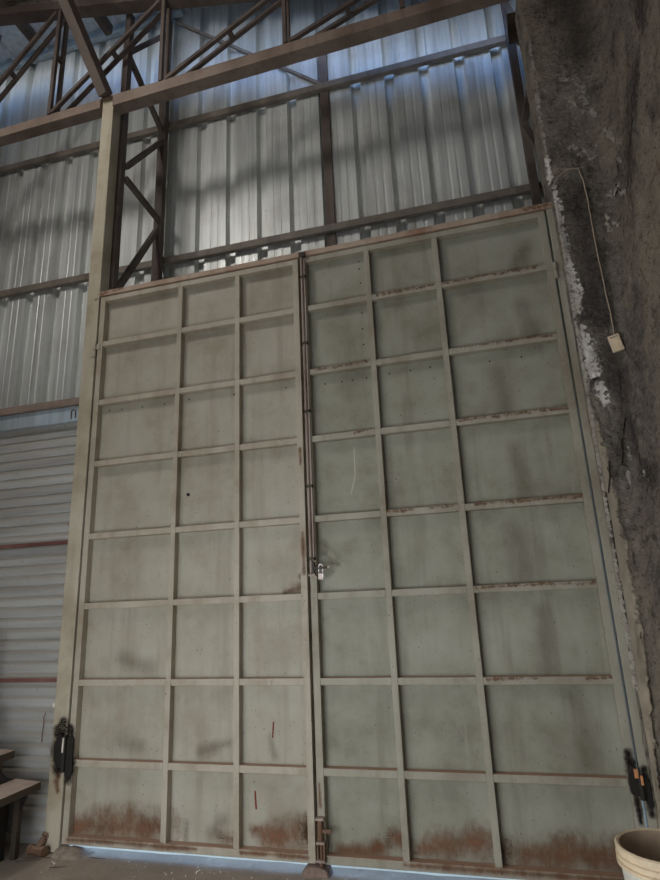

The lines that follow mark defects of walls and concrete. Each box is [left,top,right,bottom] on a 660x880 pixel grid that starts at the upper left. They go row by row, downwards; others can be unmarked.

leakage [527,37,639,691]
rust [67,809,196,850]
rust [240,816,308,859]
rust [338,831,402,855]
rust [410,829,625,880]